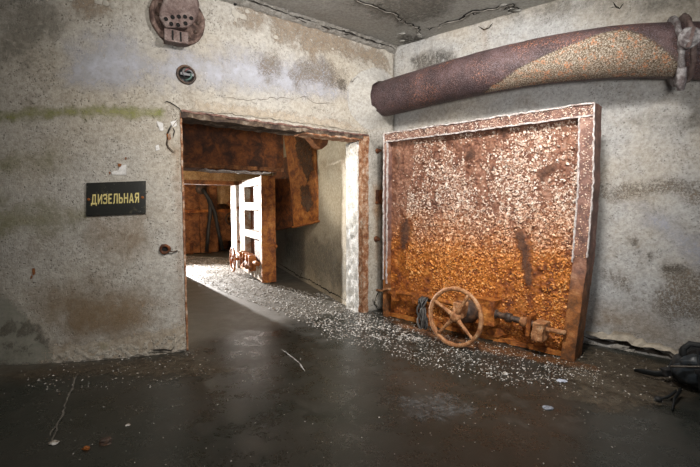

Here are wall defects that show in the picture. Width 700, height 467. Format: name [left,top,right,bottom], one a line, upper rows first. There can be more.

crack [354,0,519,34]
water stain [161,54,336,95]
rust [398,317,594,369]